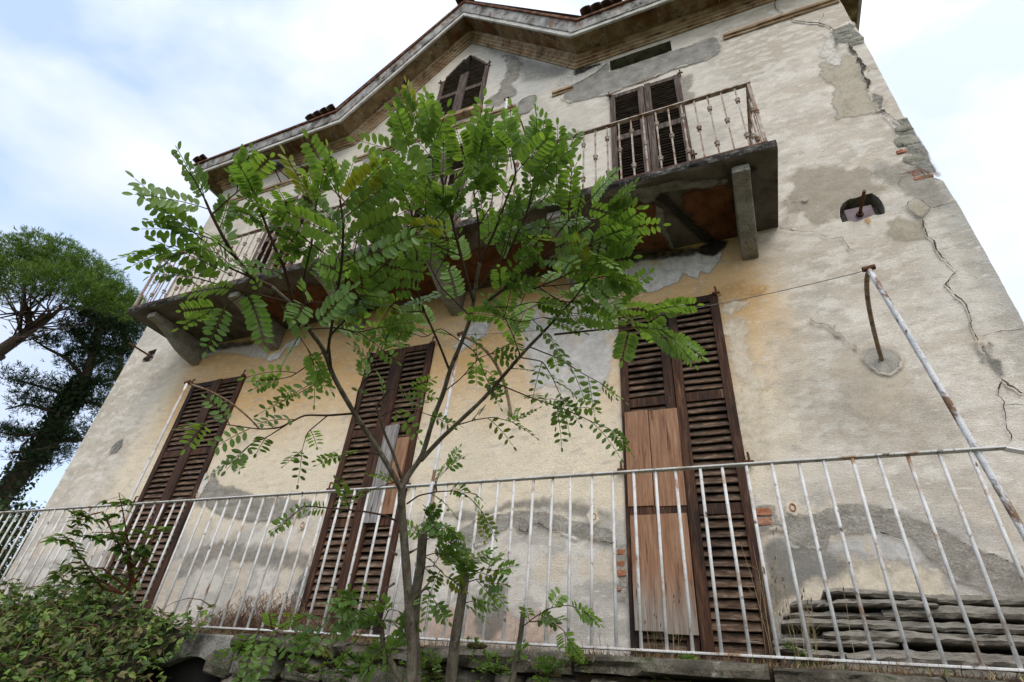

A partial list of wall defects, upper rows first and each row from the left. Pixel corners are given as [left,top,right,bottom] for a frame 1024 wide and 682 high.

spalling [561,37,721,103]
crack [774,0,895,120]
spalling [517,95,537,114]
spalling [892,117,940,181]
leakage [787,166,885,223]
peeling [619,249,723,292]
crack [898,170,1023,340]
peeling [525,303,616,402]
crack [998,378,1024,442]